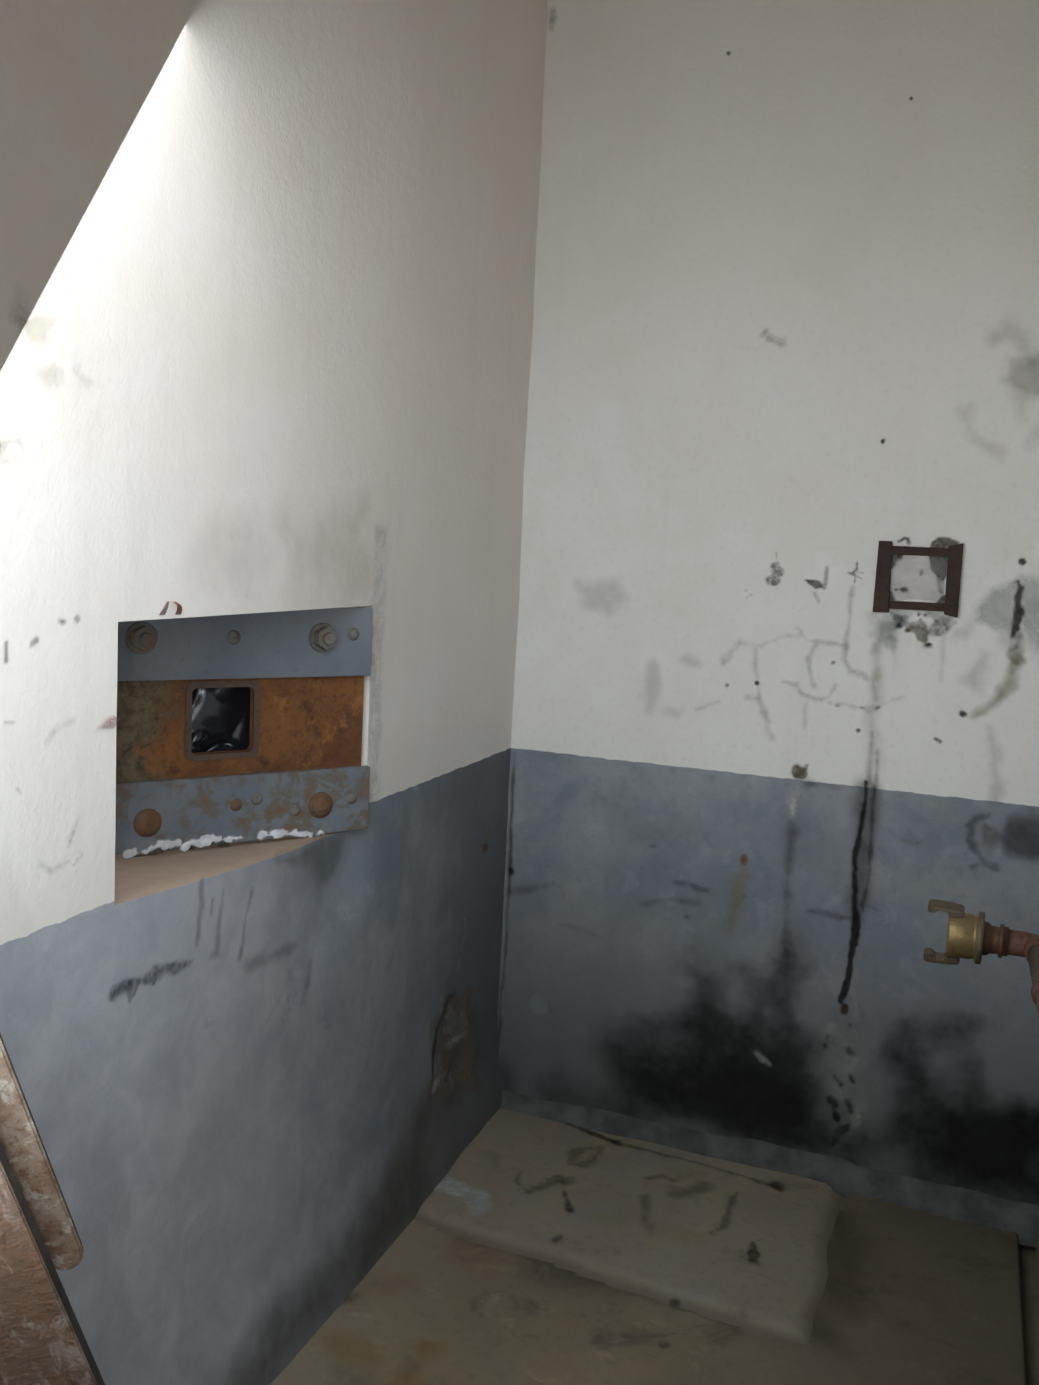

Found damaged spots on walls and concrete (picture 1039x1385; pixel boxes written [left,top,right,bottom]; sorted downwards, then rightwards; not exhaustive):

crack [1001,581,1024,695]
crack [838,781,875,1014]
water stain [621,960,813,1141]
water stain [897,1066,1039,1195]